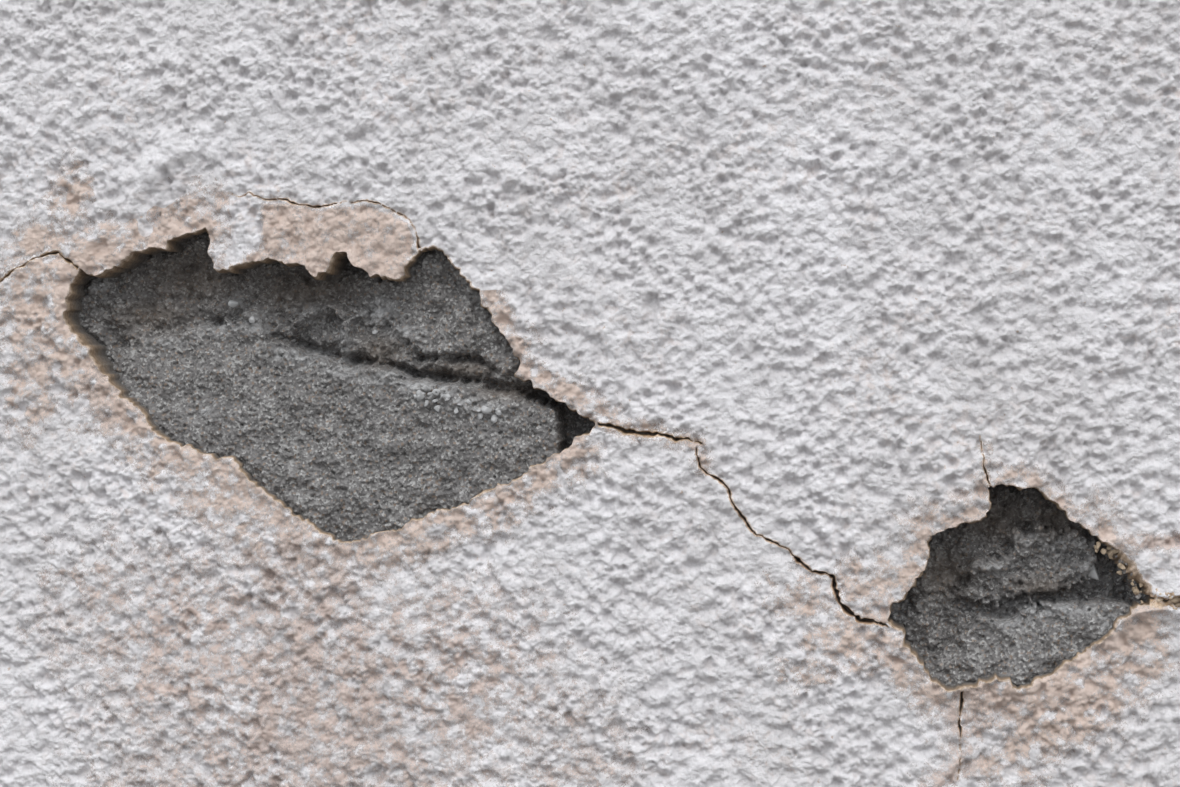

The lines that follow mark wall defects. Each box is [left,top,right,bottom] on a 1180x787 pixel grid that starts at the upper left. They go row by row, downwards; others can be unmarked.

spalling [61,203,598,544]
crack [597,417,888,628]
spalling [885,483,1158,693]
crack [1149,587,1180,610]